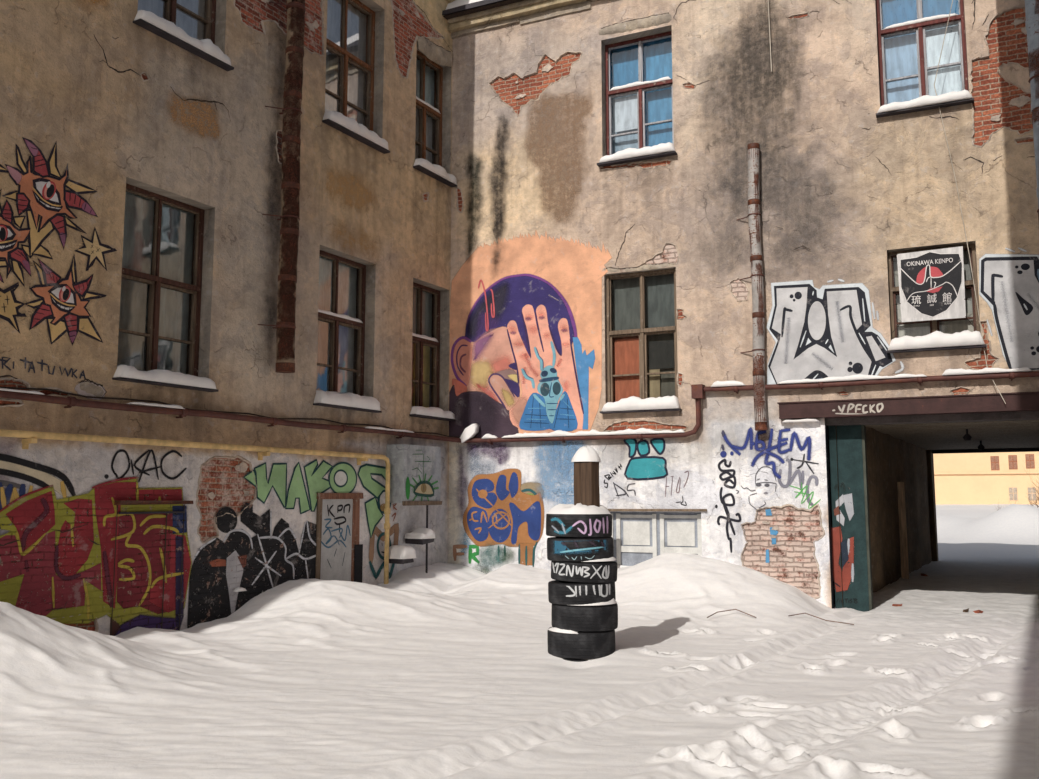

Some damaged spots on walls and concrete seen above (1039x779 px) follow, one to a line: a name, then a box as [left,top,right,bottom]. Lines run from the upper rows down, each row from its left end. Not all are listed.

crack [94,35,139,75]
flaking render [489,51,583,117]
damp [710,7,792,149]
flaking render [969,5,1034,148]
rust [1028,48,1039,125]
rust [276,0,305,360]
damp [467,119,507,255]
damp [527,95,591,221]
rust [750,173,764,336]
rust [753,357,767,449]
flaking render [196,455,257,544]
flaking render [741,504,825,599]